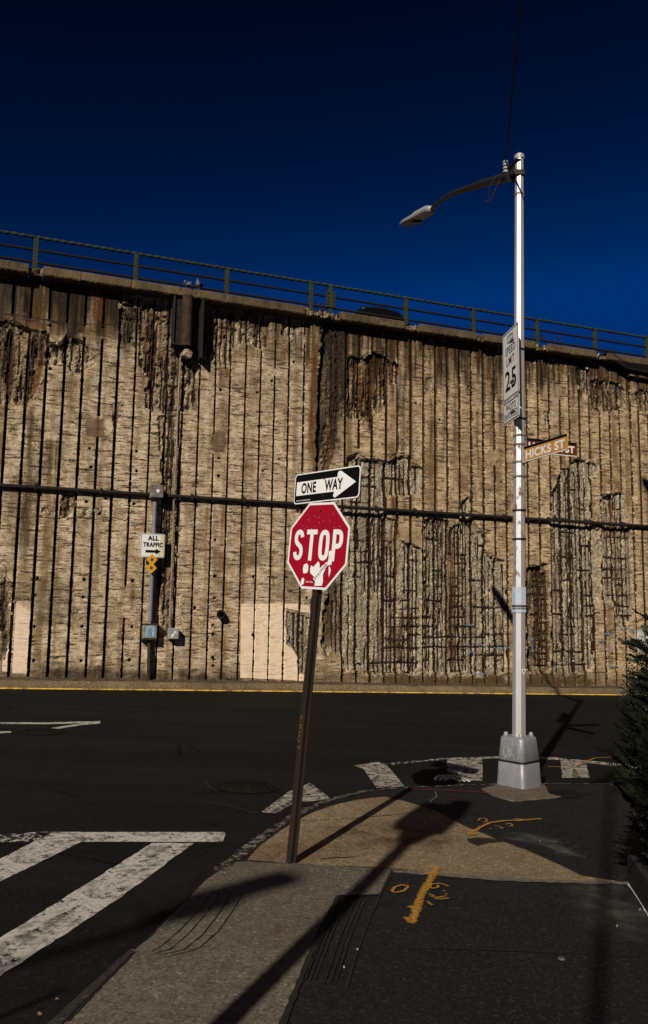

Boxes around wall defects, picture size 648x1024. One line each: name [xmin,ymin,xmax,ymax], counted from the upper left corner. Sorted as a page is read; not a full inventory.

water stain [1,277,171,380]
spalling [285,436,507,678]
spalling [526,459,634,678]